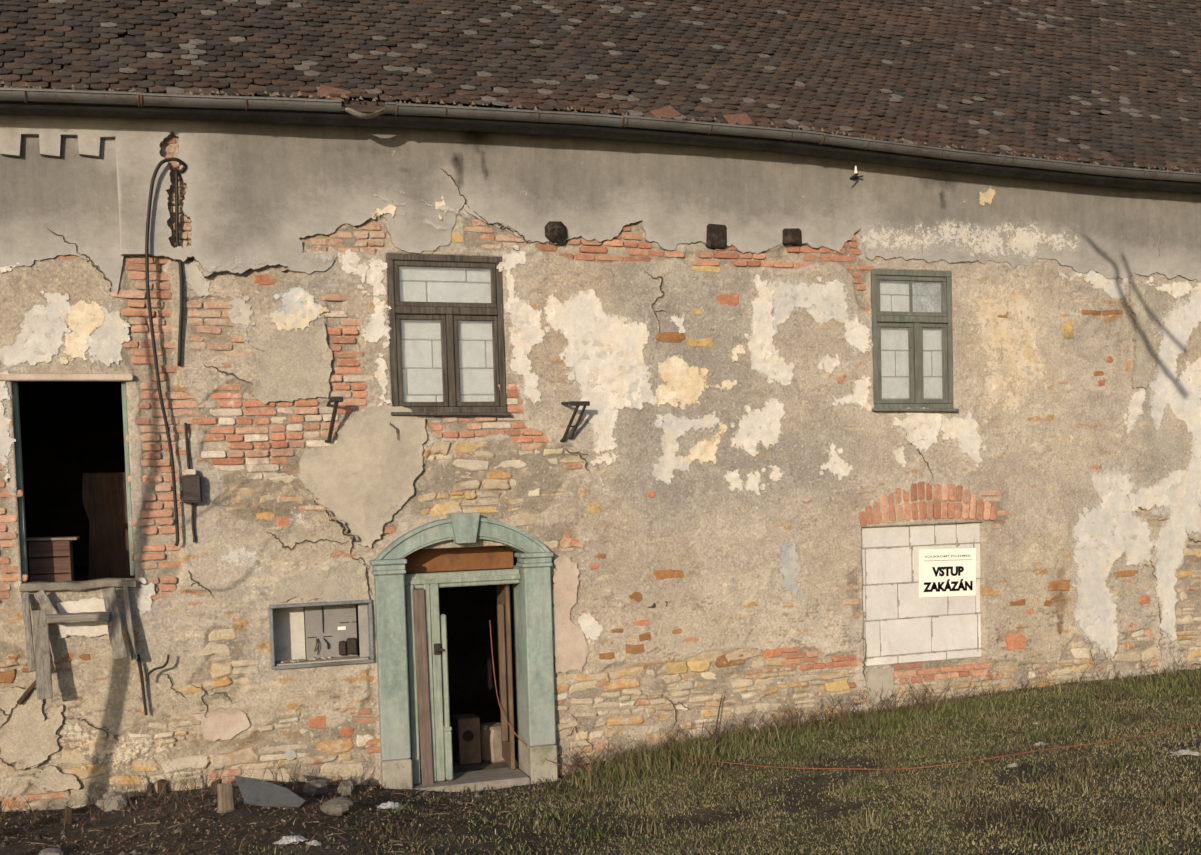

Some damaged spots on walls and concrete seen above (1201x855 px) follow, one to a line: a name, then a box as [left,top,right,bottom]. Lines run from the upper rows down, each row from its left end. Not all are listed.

crack [440,168,530,243]
crack [48,229,118,298]
crack [644,271,667,343]
peeling [1058,270,1128,300]
flaking render [0,137,396,616]
peeling [418,219,874,527]
crack [266,497,372,595]
flaking render [543,529,584,552]
peeling [892,277,1201,707]
flaking render [0,681,380,808]
flaking render [174,629,259,693]
flaking render [554,646,869,774]